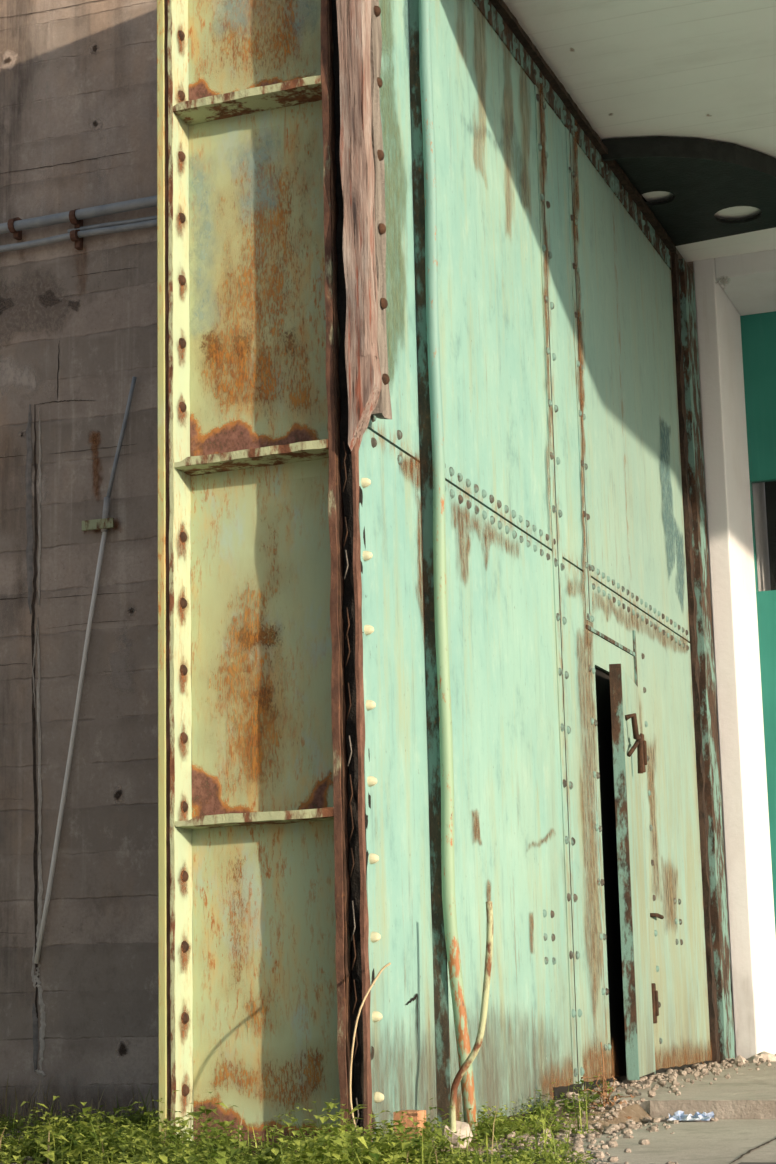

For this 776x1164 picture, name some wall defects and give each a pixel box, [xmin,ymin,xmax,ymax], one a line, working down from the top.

rust [178,0,309,102]
rust [504,68,547,229]
rust [178,138,319,457]
rust [92,433,101,496]
rust [454,506,519,581]
rust [568,122,687,1015]
rust [178,524,297,821]
rust [298,772,333,810]
rust [229,859,248,984]
rust [181,1046,340,1142]
crack [729,1138,776,1164]